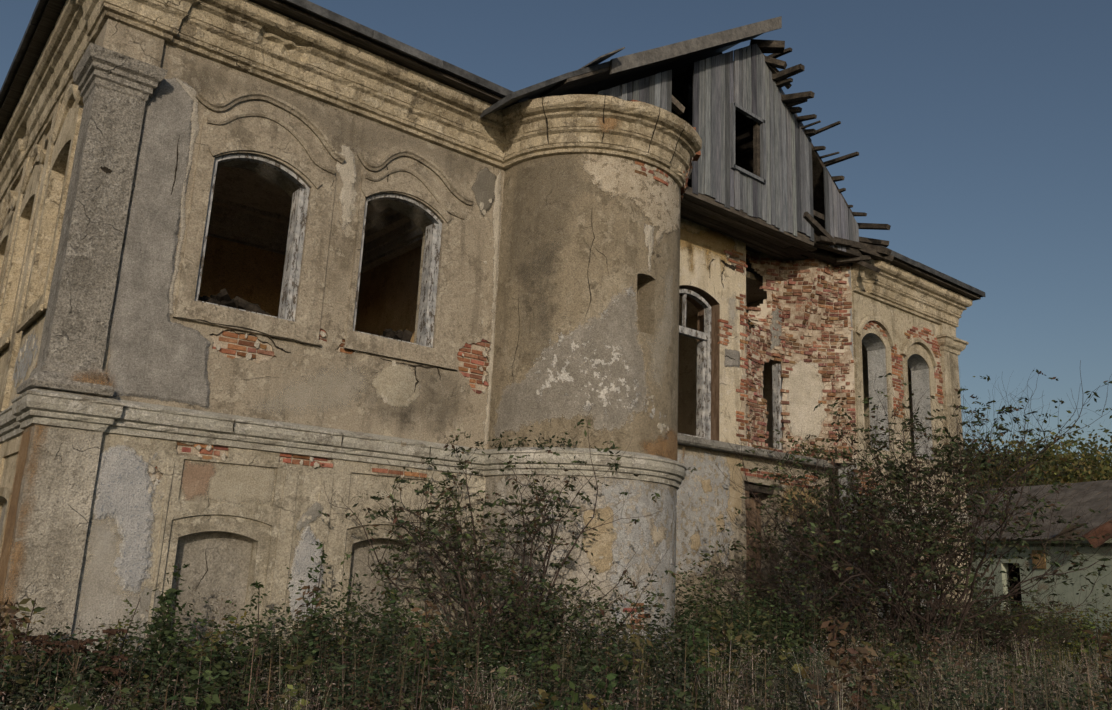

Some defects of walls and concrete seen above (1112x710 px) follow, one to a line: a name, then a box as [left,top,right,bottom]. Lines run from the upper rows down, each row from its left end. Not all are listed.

crack [171,135,180,195]
peeling [336,145,357,235]
spalling [471,167,496,217]
crack [585,213,609,317]
flaking render [583,154,693,272]
spalling [209,330,275,364]
spalling [457,339,492,395]
flaking render [493,286,669,439]
spalling [176,442,228,461]
flaking render [581,249,944,647]
flaking render [93,445,168,640]
flaking render [288,502,325,622]